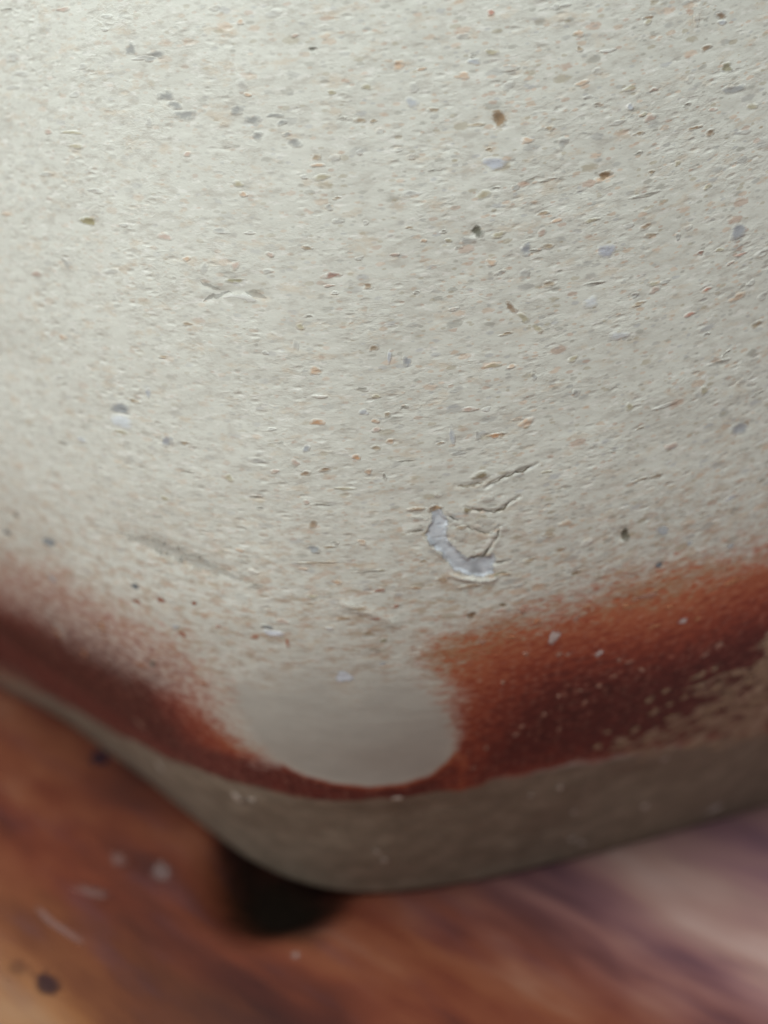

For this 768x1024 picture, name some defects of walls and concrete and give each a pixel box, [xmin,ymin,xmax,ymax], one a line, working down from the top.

rust [0,501,768,808]
crack [405,466,531,590]